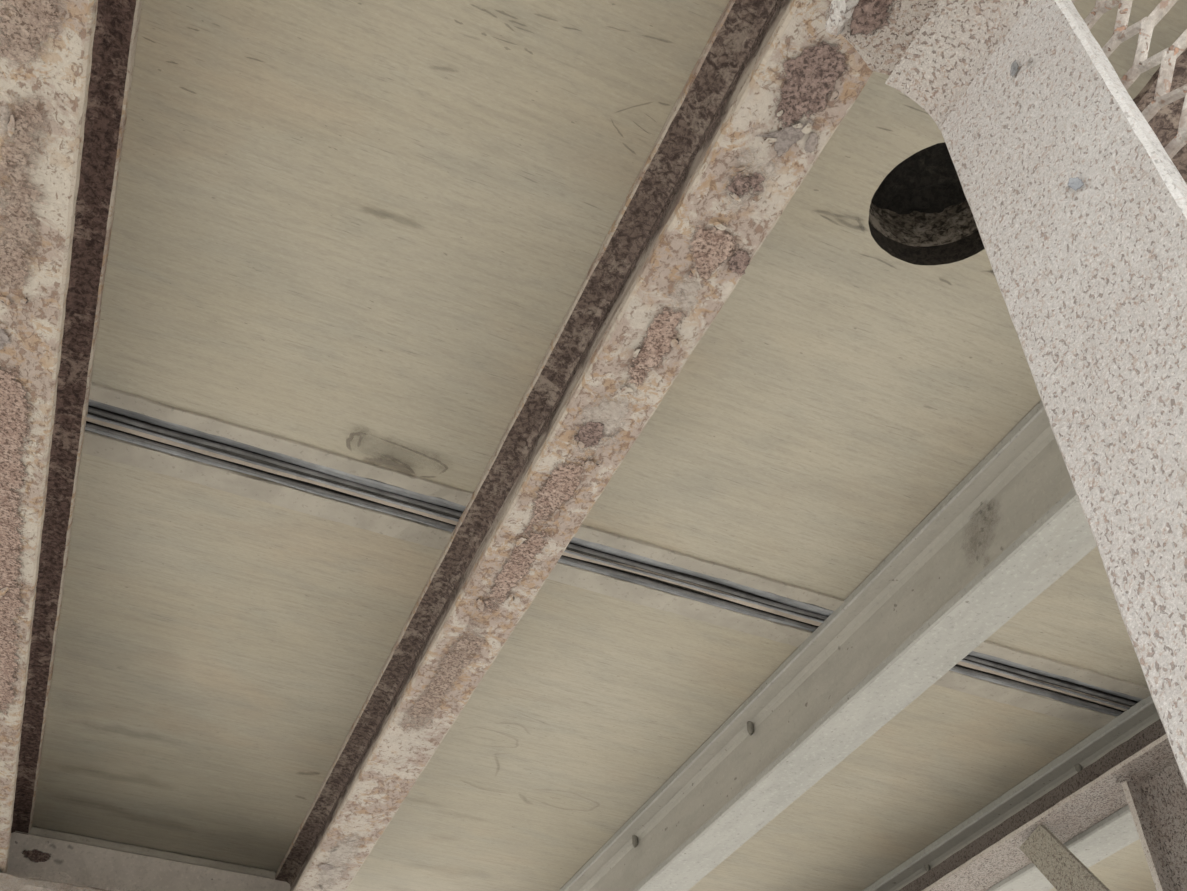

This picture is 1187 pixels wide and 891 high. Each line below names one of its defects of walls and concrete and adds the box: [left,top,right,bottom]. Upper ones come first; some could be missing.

corrosion [0,97,47,306]
corrosion [0,0,62,63]
corrosion [528,0,788,460]
corrosion [773,0,893,129]
corrosion [0,365,34,715]
corrosion [22,849,51,863]
corrosion [306,575,464,859]
corrosion [401,421,607,731]